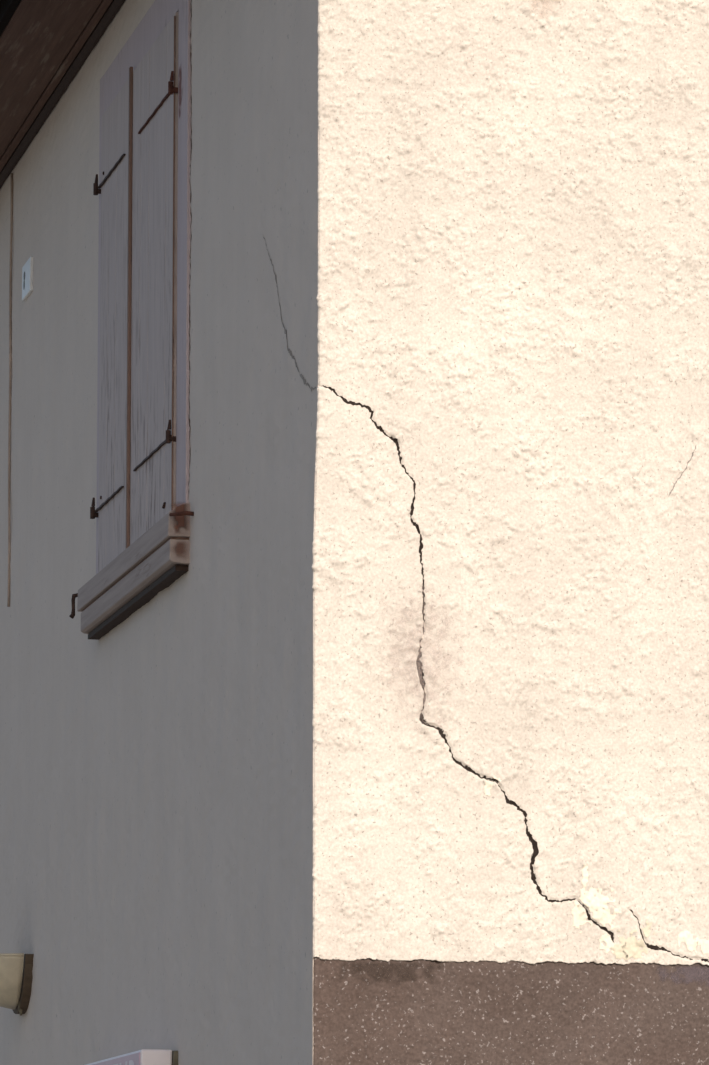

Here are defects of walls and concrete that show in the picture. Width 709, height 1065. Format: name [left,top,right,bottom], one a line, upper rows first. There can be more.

crack [668,445,696,497]
crack [263,237,614,942]
crack [630,910,709,962]